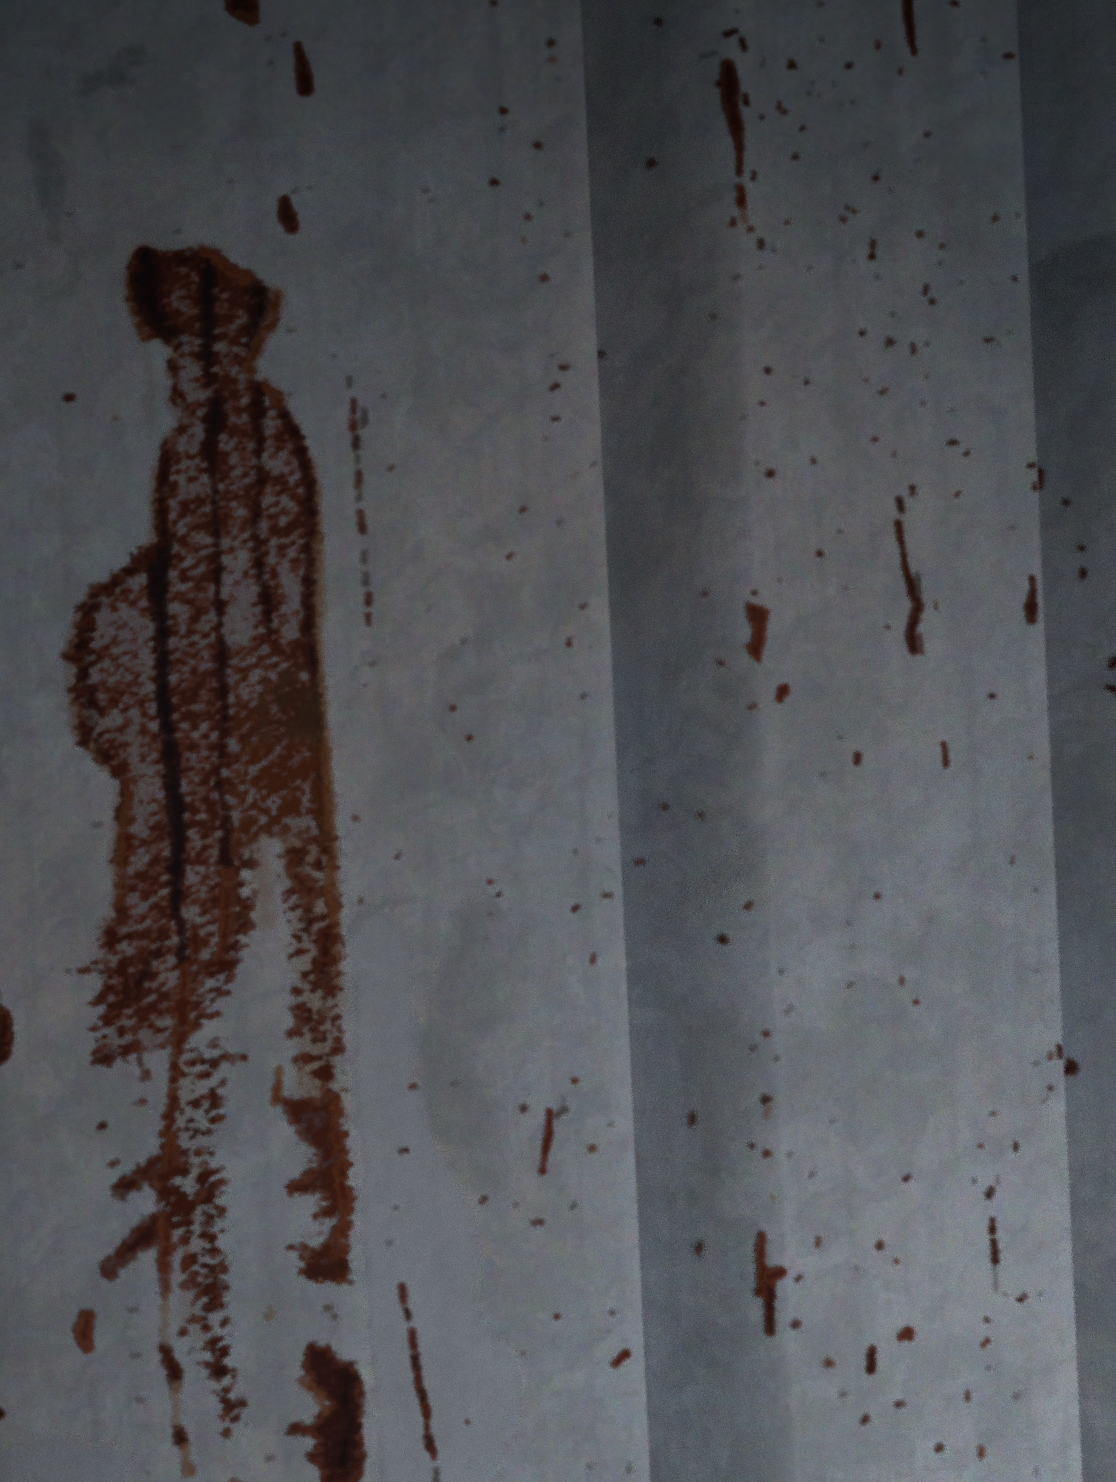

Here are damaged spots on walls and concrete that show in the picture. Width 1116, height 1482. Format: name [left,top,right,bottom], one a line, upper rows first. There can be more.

rust [715,29,788,250]
rust [747,591,770,664]
rust [887,485,937,656]
rust [1106,658,1116,693]
rust [62,246,368,1482]
rust [0,995,15,1066]
rust [755,1232,803,1337]
rust [399,1283,439,1482]